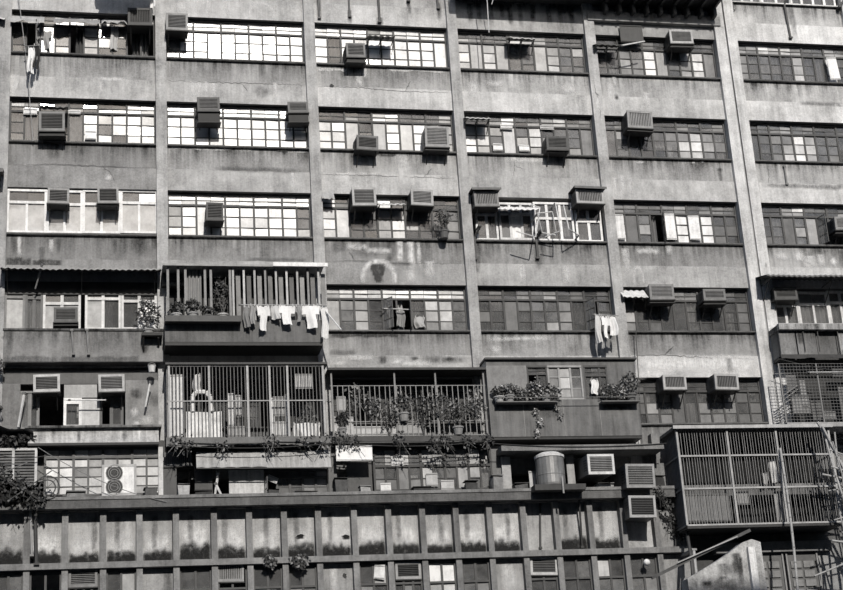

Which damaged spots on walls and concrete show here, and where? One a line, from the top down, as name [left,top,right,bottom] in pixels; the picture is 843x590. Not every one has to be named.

leakage [0,548,22,565]
leakage [32,536,60,564]
leakage [70,541,135,563]
leakage [145,524,519,561]
leakage [562,524,619,549]